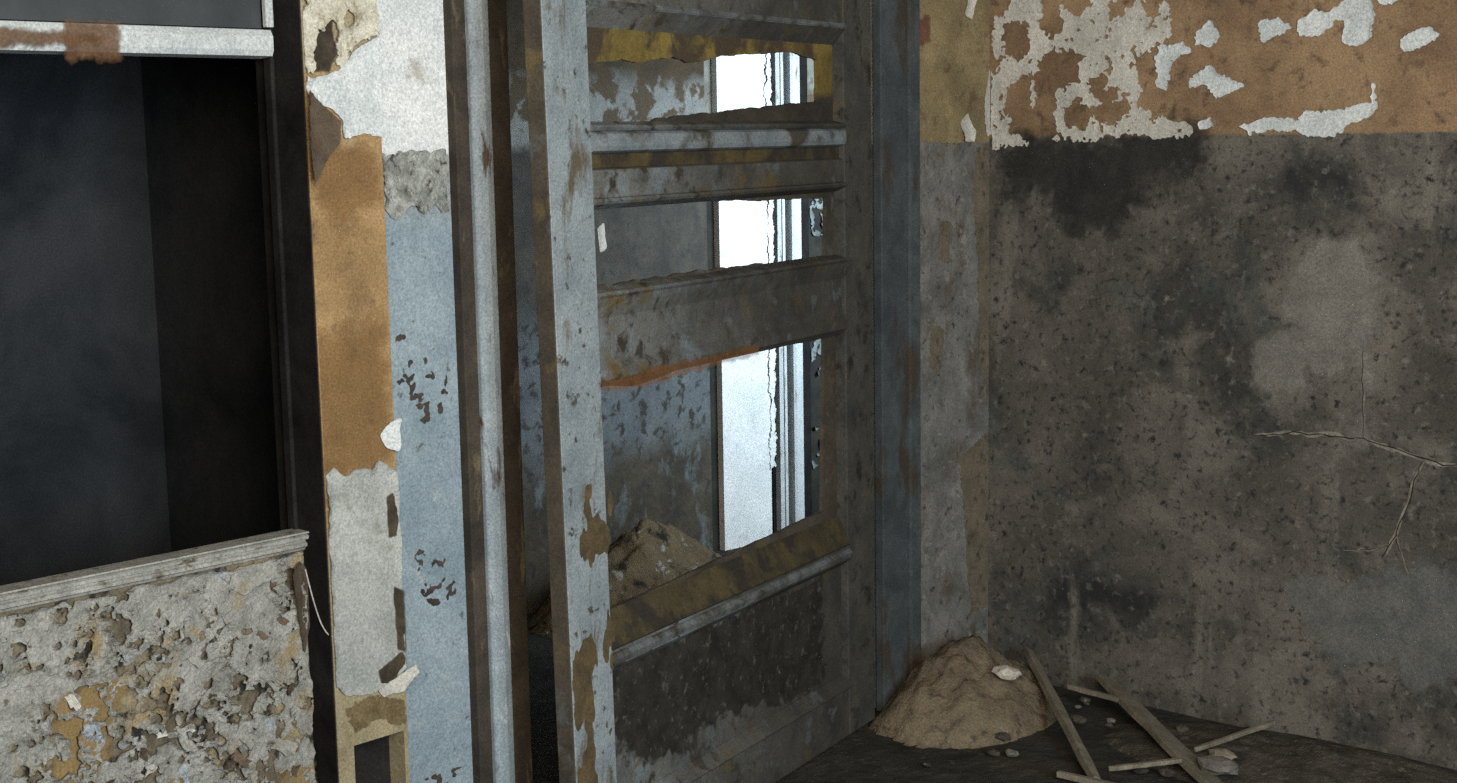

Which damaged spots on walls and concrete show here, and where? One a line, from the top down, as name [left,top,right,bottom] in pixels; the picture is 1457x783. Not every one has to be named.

peeling [1258,0,1398,46]
peeling [1400,27,1439,52]
peeling [302,0,450,220]
peeling [1189,65,1244,99]
peeling [1239,83,1378,137]
peeling [920,0,1220,402]
peeling [396,357,448,424]
peeling [579,484,613,568]
peeling [325,418,456,732]
peeling [0,552,316,783]
peeling [572,609,616,783]